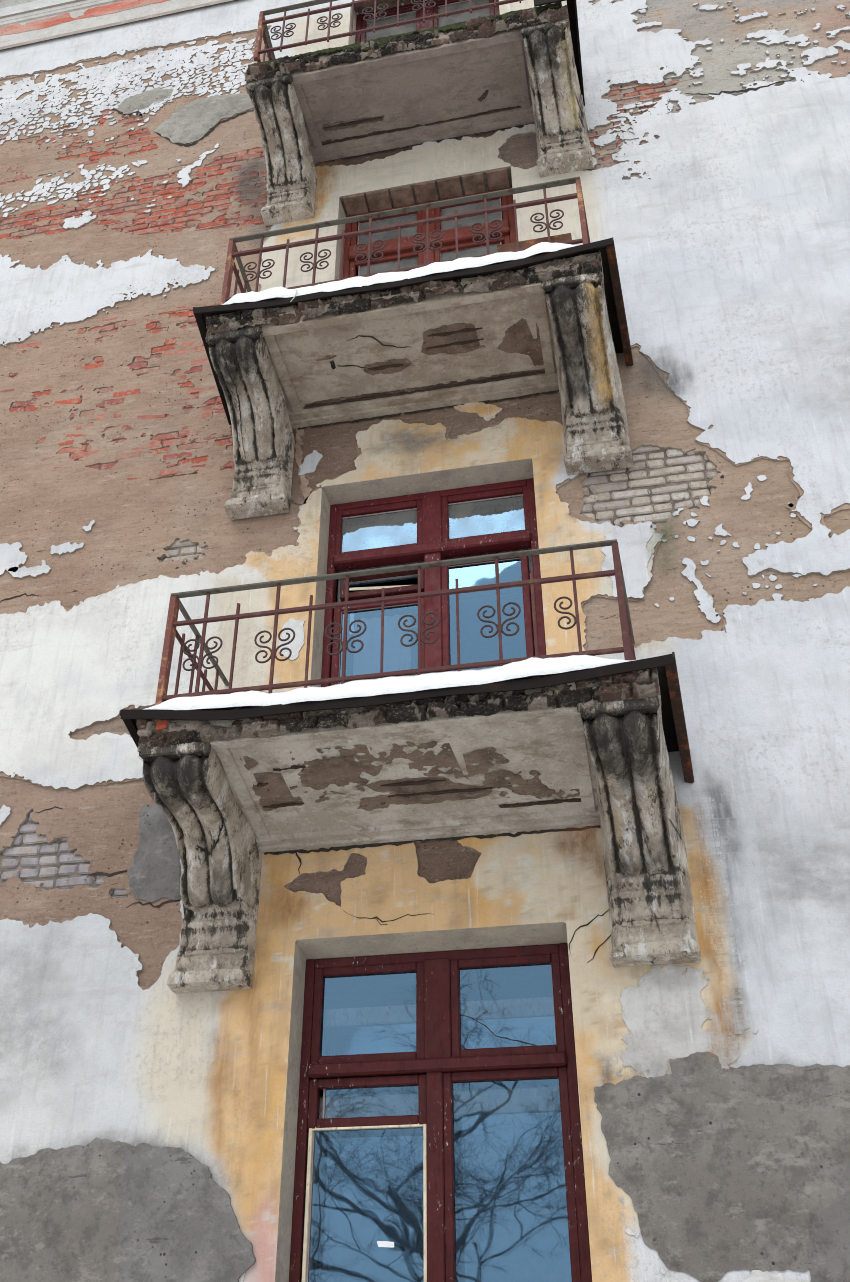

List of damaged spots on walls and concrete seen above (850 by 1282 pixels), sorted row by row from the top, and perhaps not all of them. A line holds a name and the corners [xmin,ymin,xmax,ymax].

peeling [582,0,850,180]
flaking render [0,0,602,614]
crack [316,335,409,368]
flaking render [556,344,850,651]
peeling [278,618,305,660]
spalling [70,668,660,748]
spalling [240,741,580,812]
flaking render [0,772,183,990]
flaking render [285,853,367,907]
flaking render [414,839,481,883]
crack [344,911,430,925]
crack [569,909,611,963]